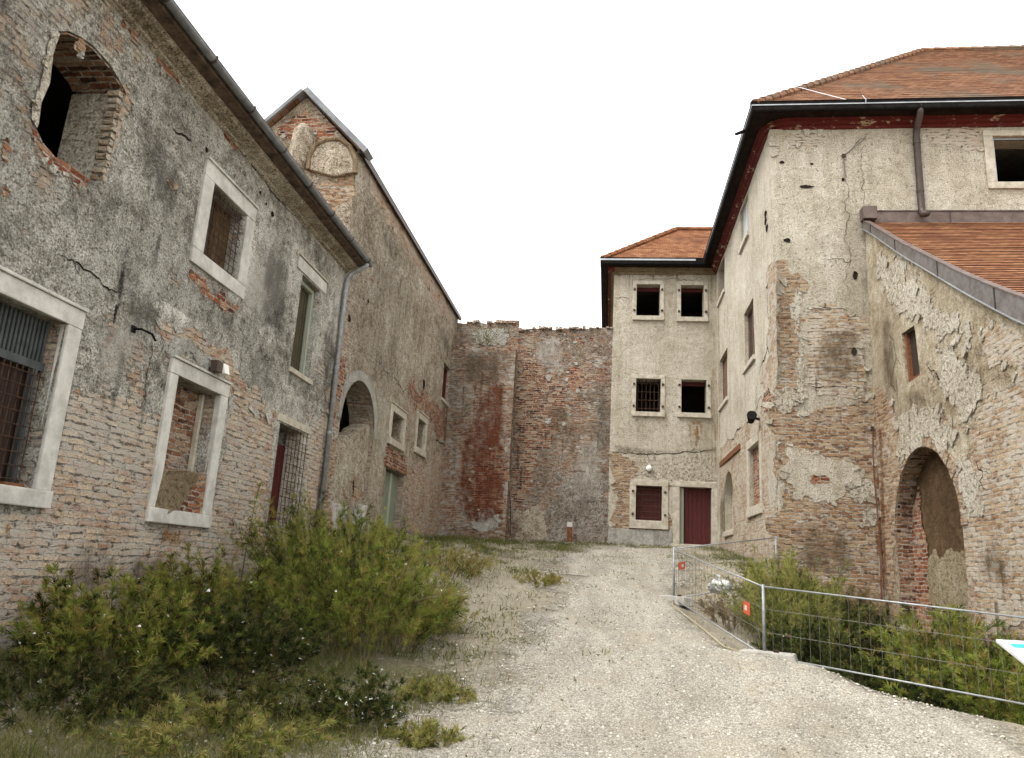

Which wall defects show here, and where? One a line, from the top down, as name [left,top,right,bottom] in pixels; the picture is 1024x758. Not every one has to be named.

spalling [74,37,86,59]
peeling [32,128,90,195]
crack [61,255,125,301]
spalling [188,269,239,314]
crack [804,132,871,310]
peeling [0,315,277,651]
water stain [460,354,503,522]
peeling [607,451,673,533]
peeling [719,259,900,603]
peeling [912,486,937,637]
peeling [945,318,1024,637]